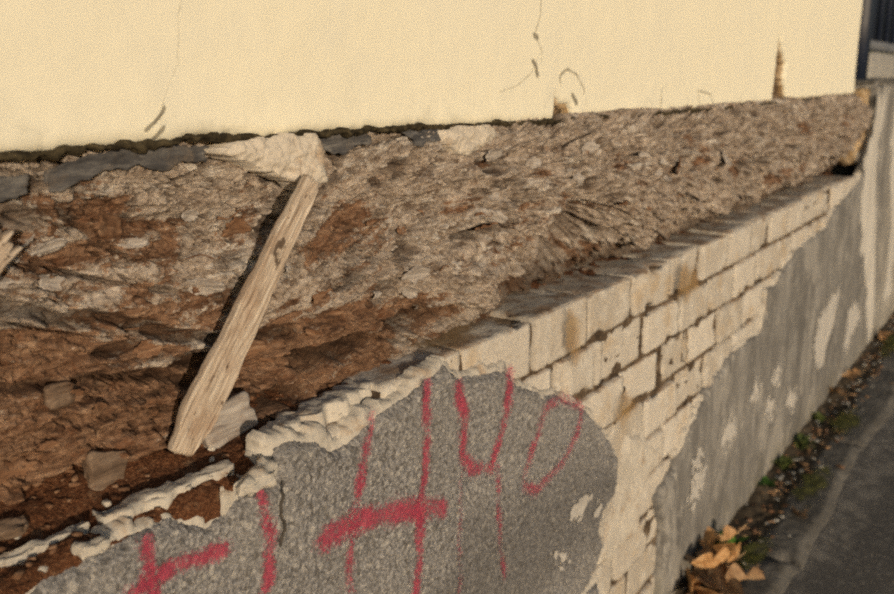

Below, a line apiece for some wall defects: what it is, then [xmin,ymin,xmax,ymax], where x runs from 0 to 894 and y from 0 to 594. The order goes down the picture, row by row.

peeling [473,187,510,231]
peeling [30,221,67,257]
peeling [117,237,148,249]
peeling [38,274,66,291]
peeling [184,278,225,296]
peeling [401,266,430,299]
flaking render [668,87,875,458]
flaking render [245,354,617,465]
peeling [686,447,708,512]
flaking render [83,490,238,554]
peeling [570,493,611,523]
peeling [553,550,571,571]